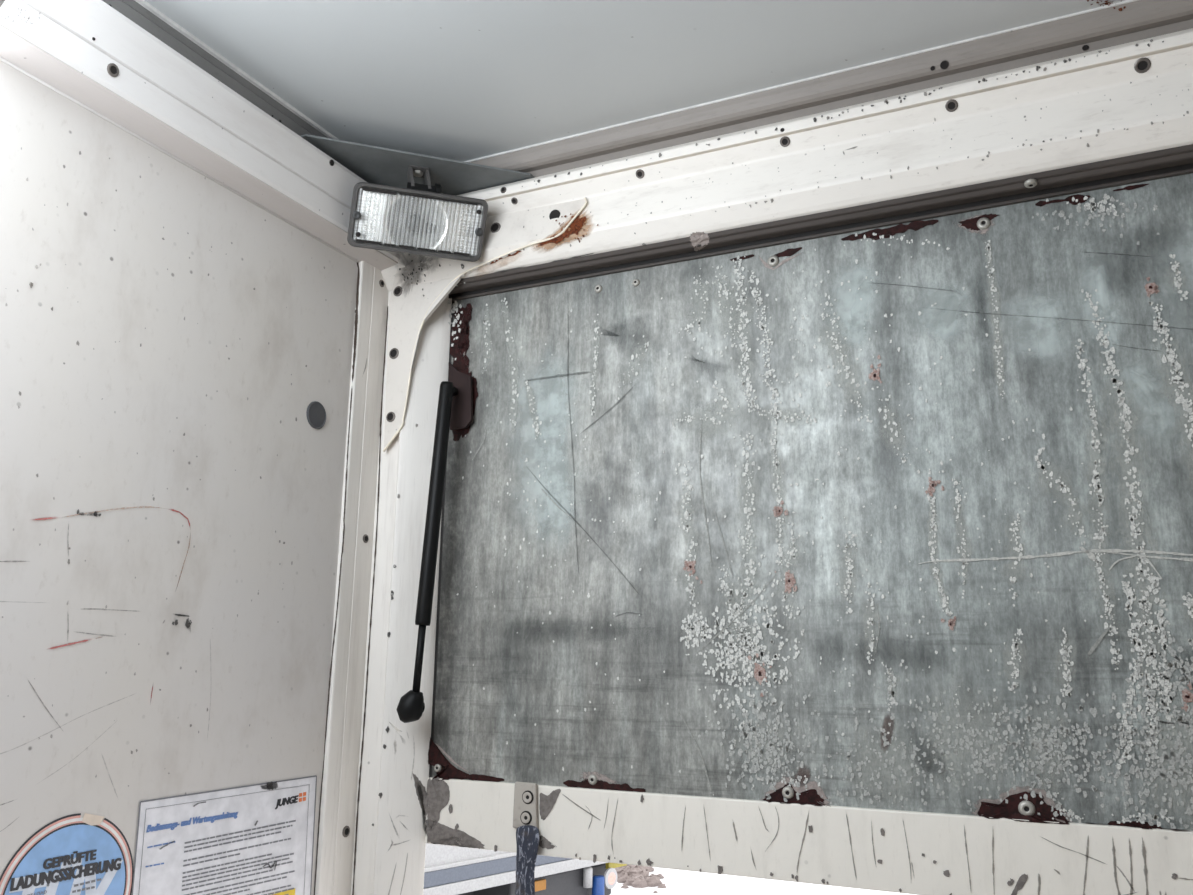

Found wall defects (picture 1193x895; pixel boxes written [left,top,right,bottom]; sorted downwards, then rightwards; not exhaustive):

corrosion [537,213,598,250]
leakage [1028,299,1054,353]
peeling [413,774,497,852]